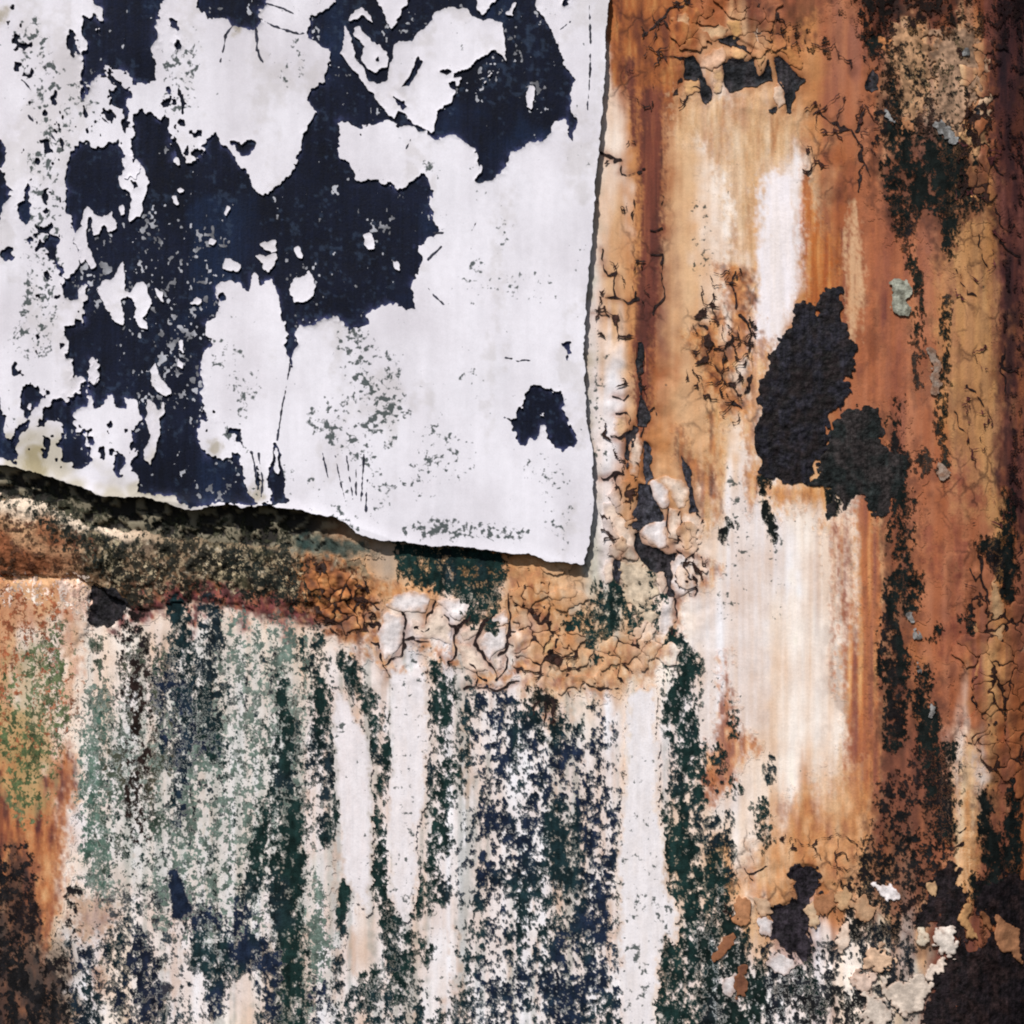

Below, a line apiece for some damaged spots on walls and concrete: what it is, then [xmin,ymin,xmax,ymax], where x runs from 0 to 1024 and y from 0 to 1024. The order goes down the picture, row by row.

crack [629,0,881,192]
peeling [878,16,993,157]
peeling [0,0,578,509]
crack [685,268,757,426]
corrosion [605,0,1024,951]
crack [951,34,1024,799]
crack [304,508,708,724]
water stain [0,243,1024,1024]
corrosion [0,551,728,1024]
peeling [722,964,748,1000]
peeling [711,863,900,976]
peeling [848,858,1024,1024]